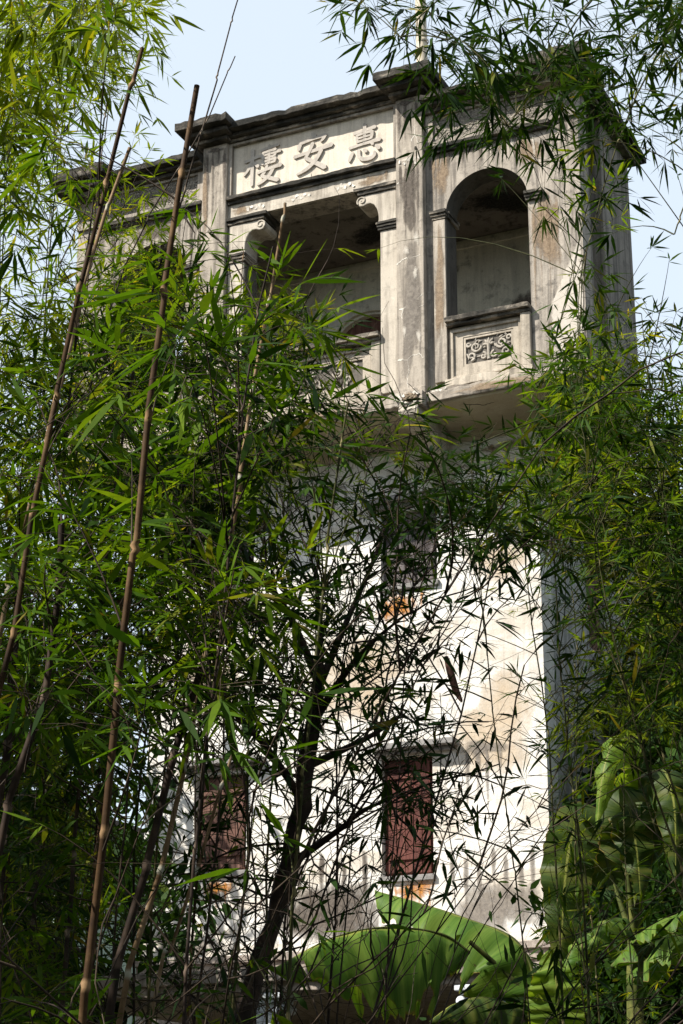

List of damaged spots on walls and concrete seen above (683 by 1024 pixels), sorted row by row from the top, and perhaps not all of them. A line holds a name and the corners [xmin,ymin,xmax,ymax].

damp [361,139,541,375]
damp [459,680,529,790]